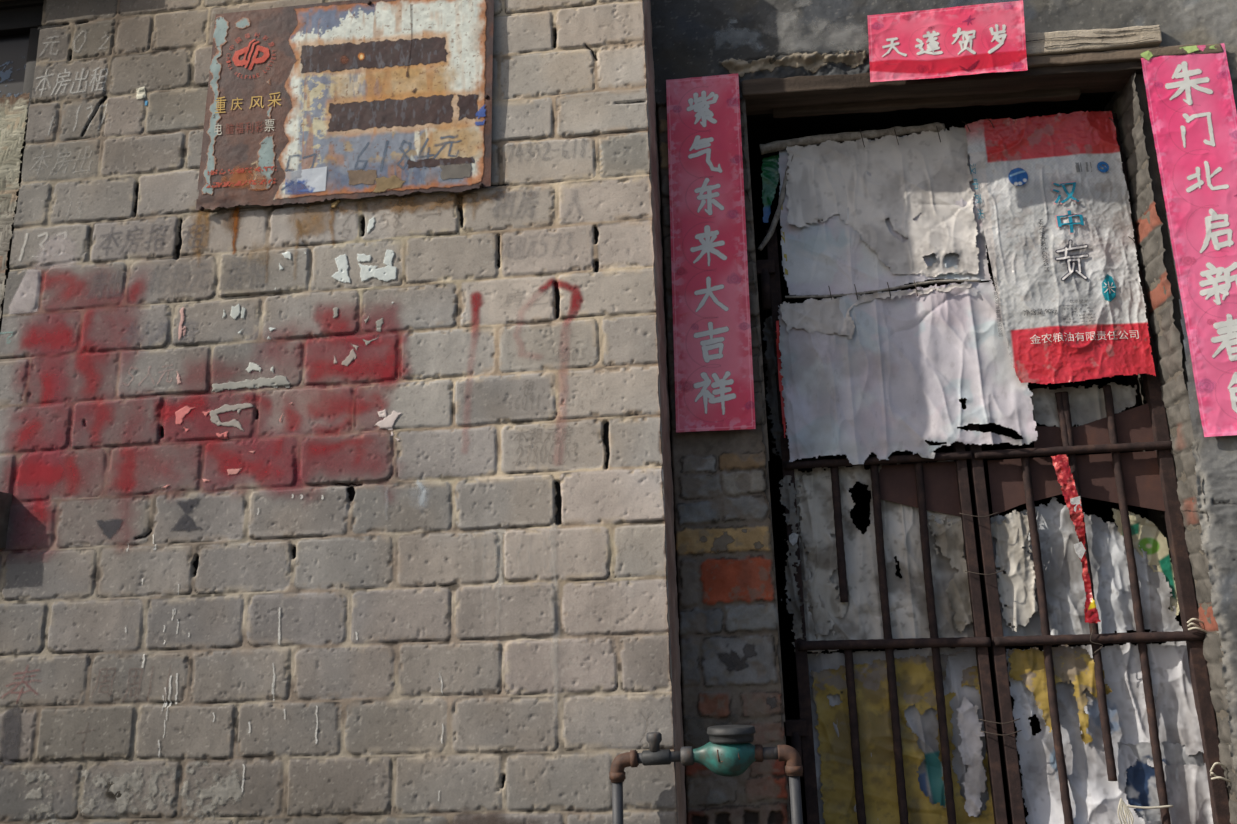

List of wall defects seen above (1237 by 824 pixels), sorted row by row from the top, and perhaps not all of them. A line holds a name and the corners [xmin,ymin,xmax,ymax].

spalling [722,50,867,77]
crack [82,96,107,136]